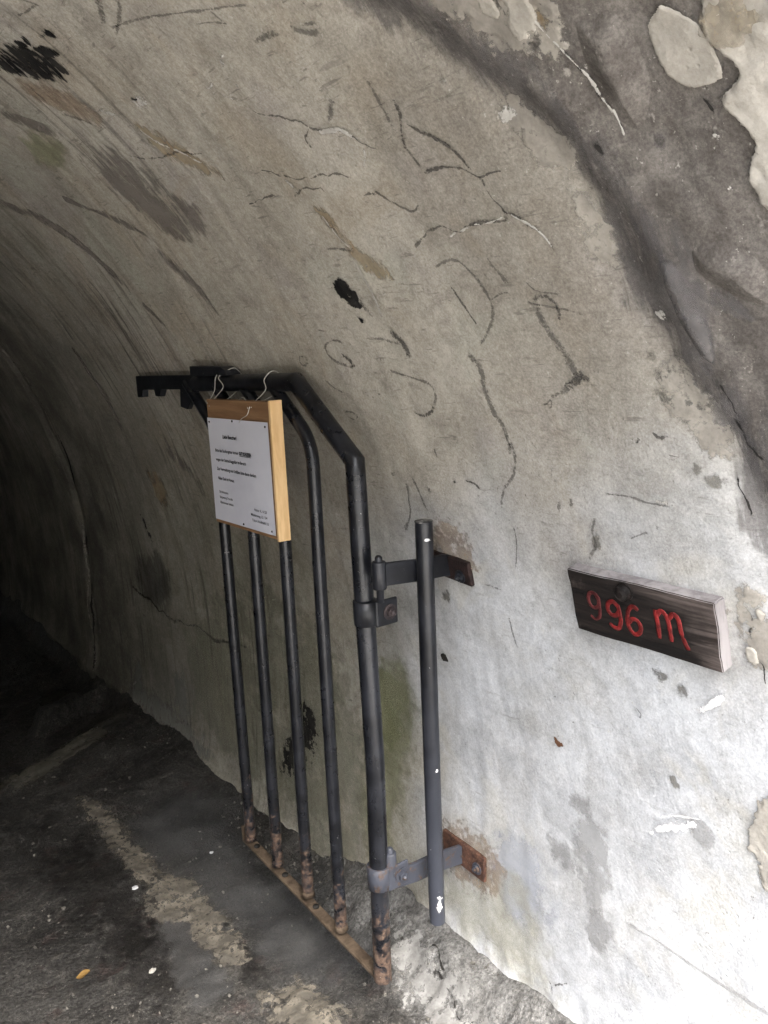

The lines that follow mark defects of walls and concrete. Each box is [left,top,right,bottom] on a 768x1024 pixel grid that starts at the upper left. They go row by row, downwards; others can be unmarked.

spalling [431,0,570,61]
crack [534,20,625,135]
flaking render [648,0,768,210]
crack [249,111,554,250]
crack [132,585,246,648]
flaking render [726,586,768,671]
flaking render [747,796,768,892]